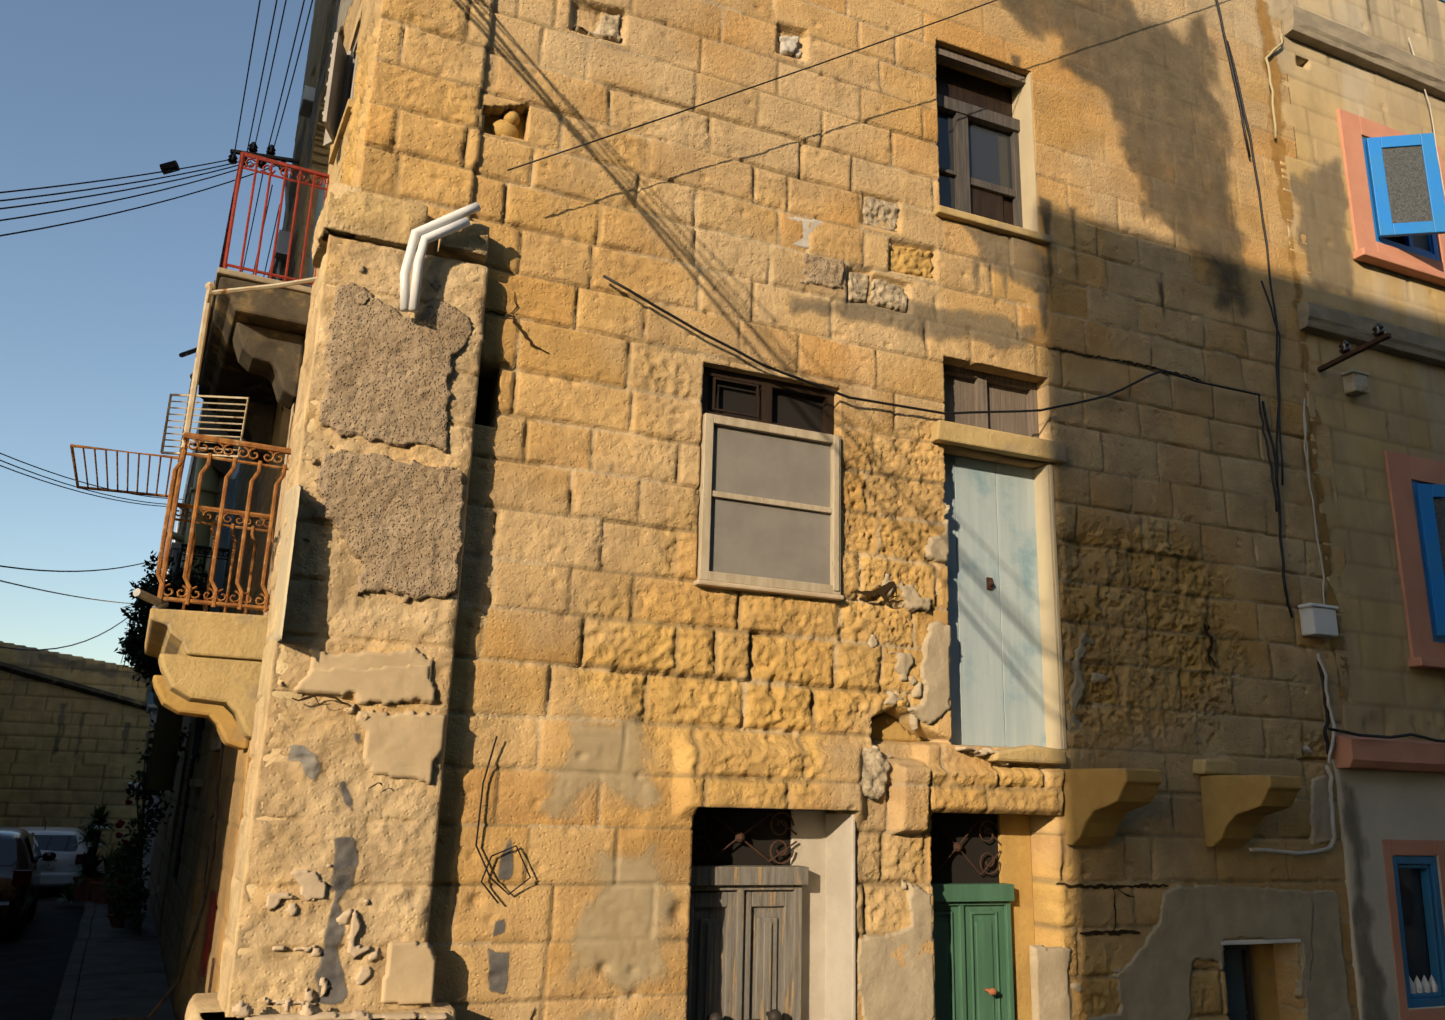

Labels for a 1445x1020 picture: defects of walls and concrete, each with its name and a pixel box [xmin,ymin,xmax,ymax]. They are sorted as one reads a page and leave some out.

peeling [906,676,922,731]
flaking render [265,864,332,916]
flaking render [272,945,323,957]
flaking render [336,899,380,985]
flaking render [232,977,330,1018]